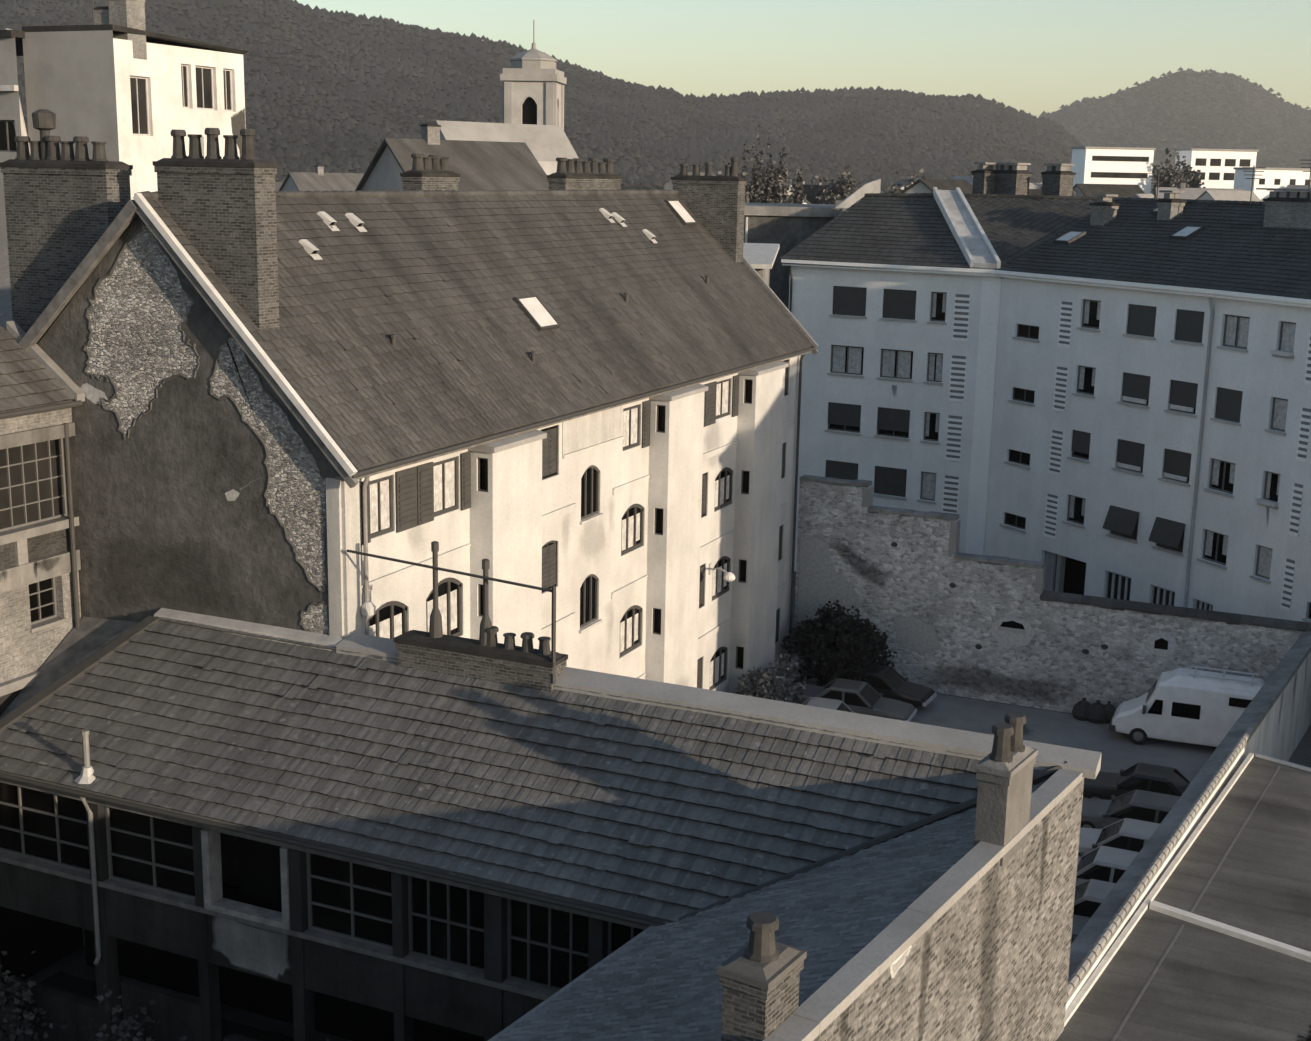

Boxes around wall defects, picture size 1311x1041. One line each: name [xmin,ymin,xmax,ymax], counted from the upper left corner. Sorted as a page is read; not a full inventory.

peeling [79,221,330,635]